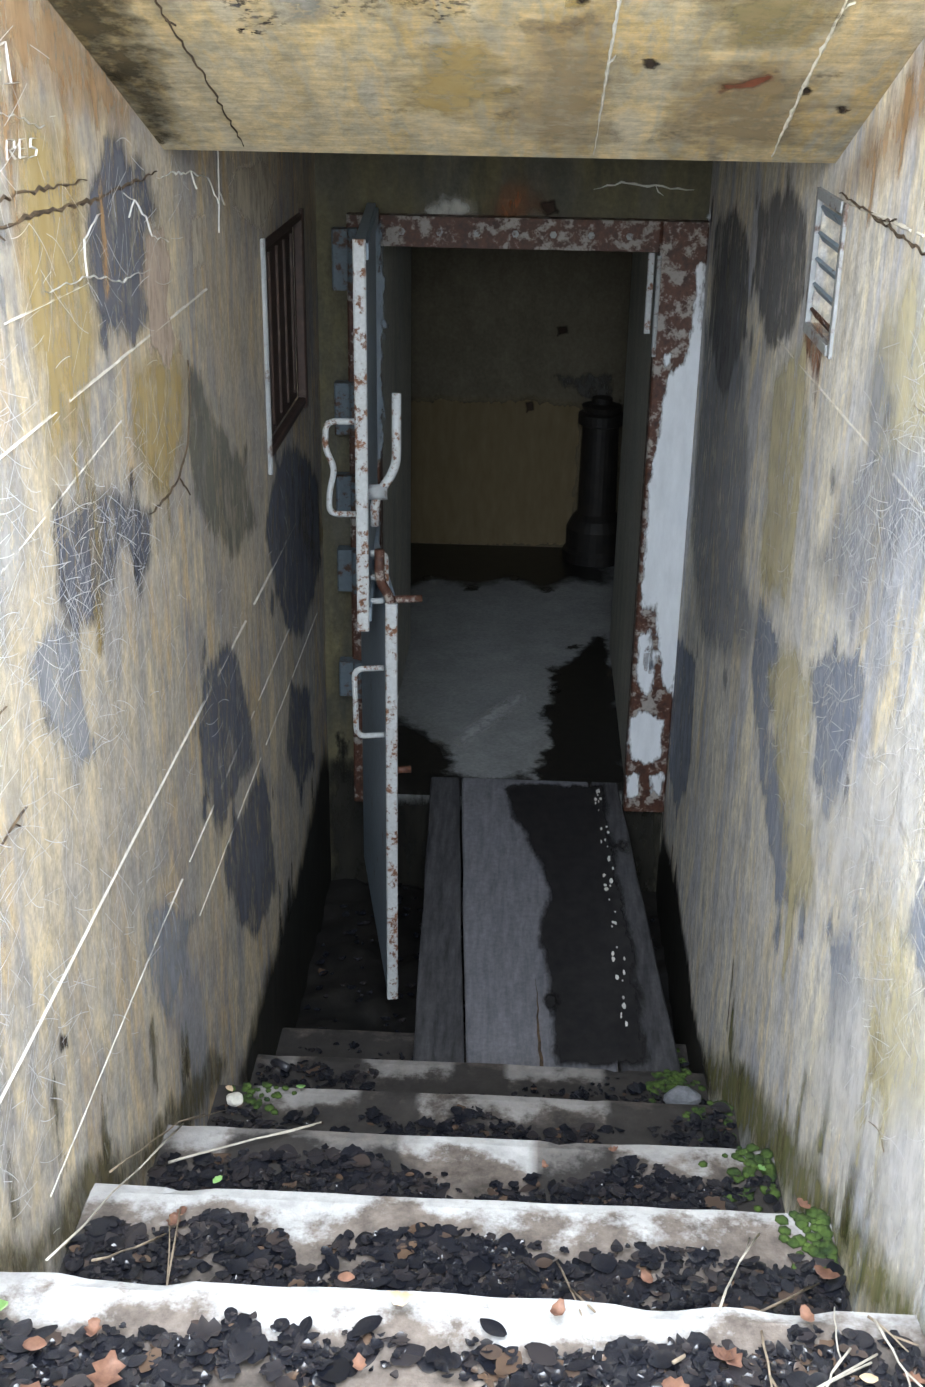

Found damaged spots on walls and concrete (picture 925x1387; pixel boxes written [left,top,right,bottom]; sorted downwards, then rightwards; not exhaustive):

water stain [48,0,175,144]
crack [0,0,244,293]
crack [771,0,856,157]
crack [839,192,925,256]